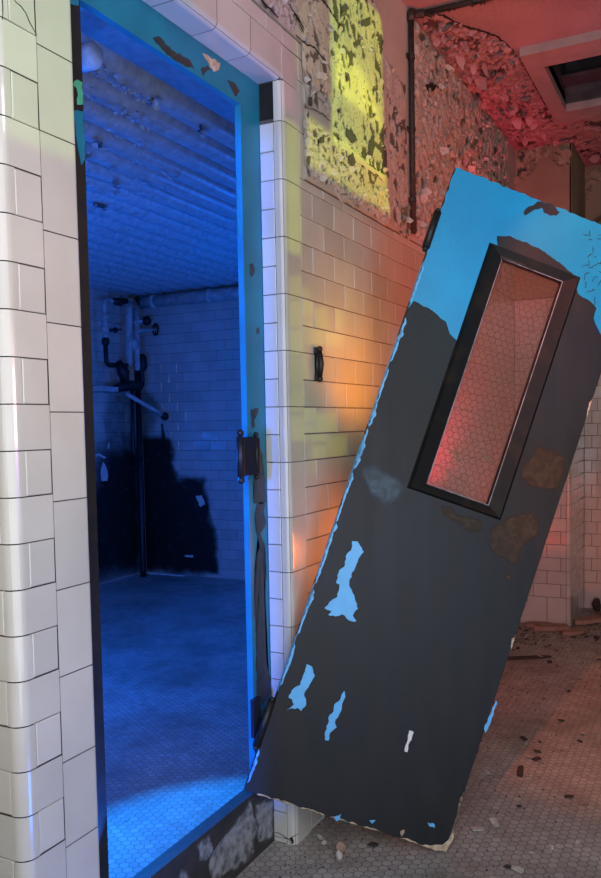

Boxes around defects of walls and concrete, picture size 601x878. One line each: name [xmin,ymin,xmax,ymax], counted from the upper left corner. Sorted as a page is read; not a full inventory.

crack [2,0,37,35]
peeling [153,36,220,76]
peeling [257,0,601,241]